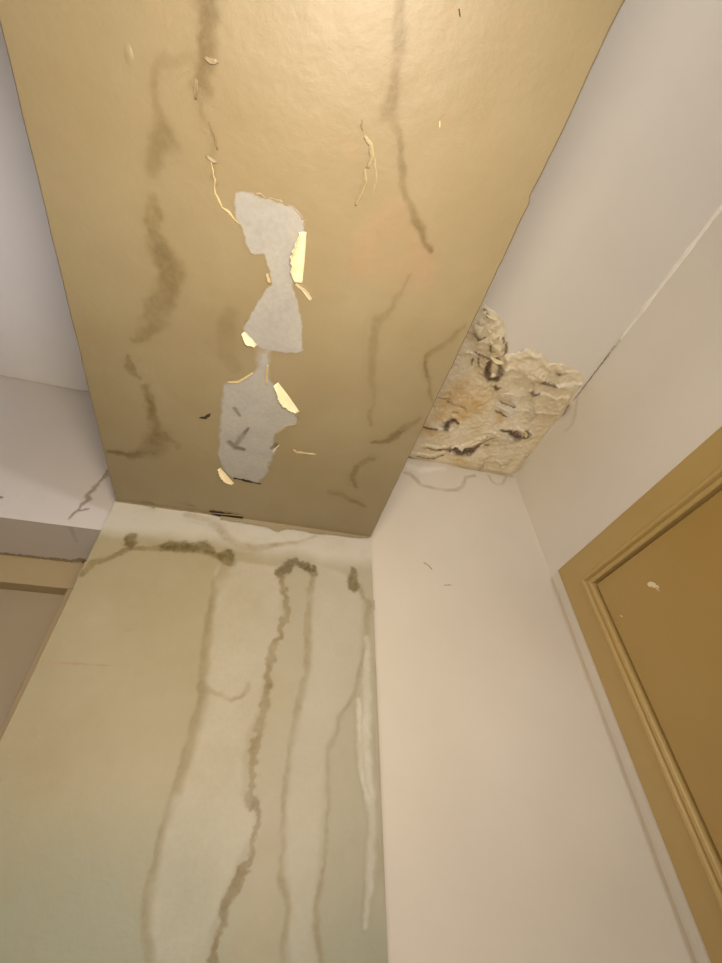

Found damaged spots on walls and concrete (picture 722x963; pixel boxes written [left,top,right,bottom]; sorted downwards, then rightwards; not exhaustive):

leakage [103,0,228,463]
leakage [208,300,246,379]
peeling [199,161,312,485]
leakage [402,461,509,493]
peeling [408,304,585,476]
leakage [77,511,385,963]